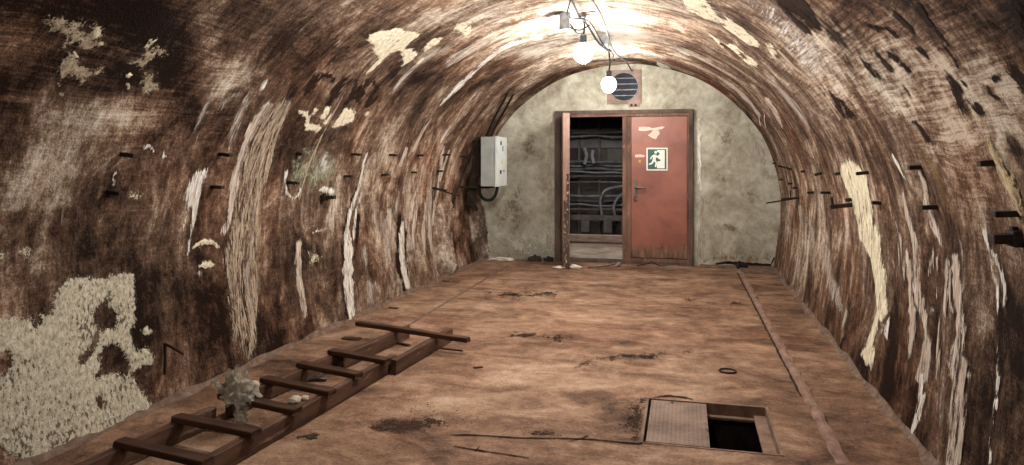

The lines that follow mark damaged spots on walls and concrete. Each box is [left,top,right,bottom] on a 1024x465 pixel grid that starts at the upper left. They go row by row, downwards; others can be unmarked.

peeling [41,15,107,96]
peeling [125,38,168,103]
peeling [366,27,442,75]
peeling [683,0,846,81]
peeling [298,106,373,133]
peeling [192,238,220,249]
peeling [0,271,158,460]